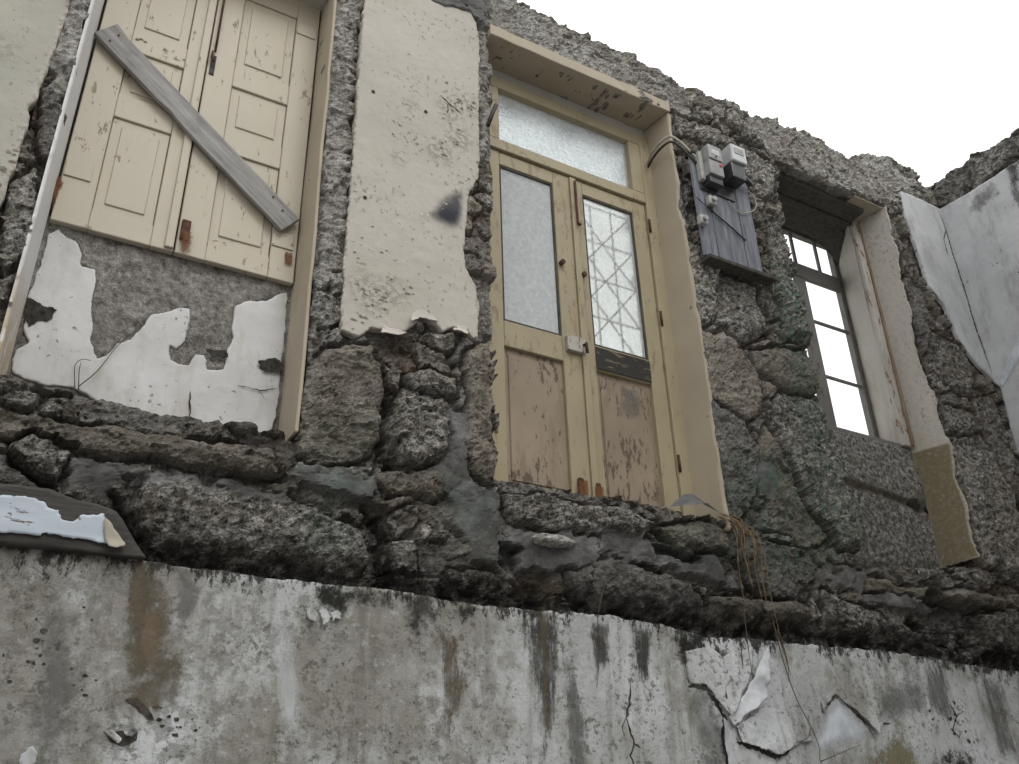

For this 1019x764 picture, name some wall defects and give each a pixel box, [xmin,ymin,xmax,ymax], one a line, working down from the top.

flaking render [24,298,57,326]
flaking render [206,349,228,359]
flaking render [258,358,284,373]
leakage [126,562,192,711]
leakage [316,584,436,637]
leakage [523,612,558,751]
leakage [591,624,609,672]
crack [622,682,640,764]
leakage [633,629,652,682]
peeling [685,645,883,764]
peeling [19,746,37,764]
leakage [935,750,975,764]